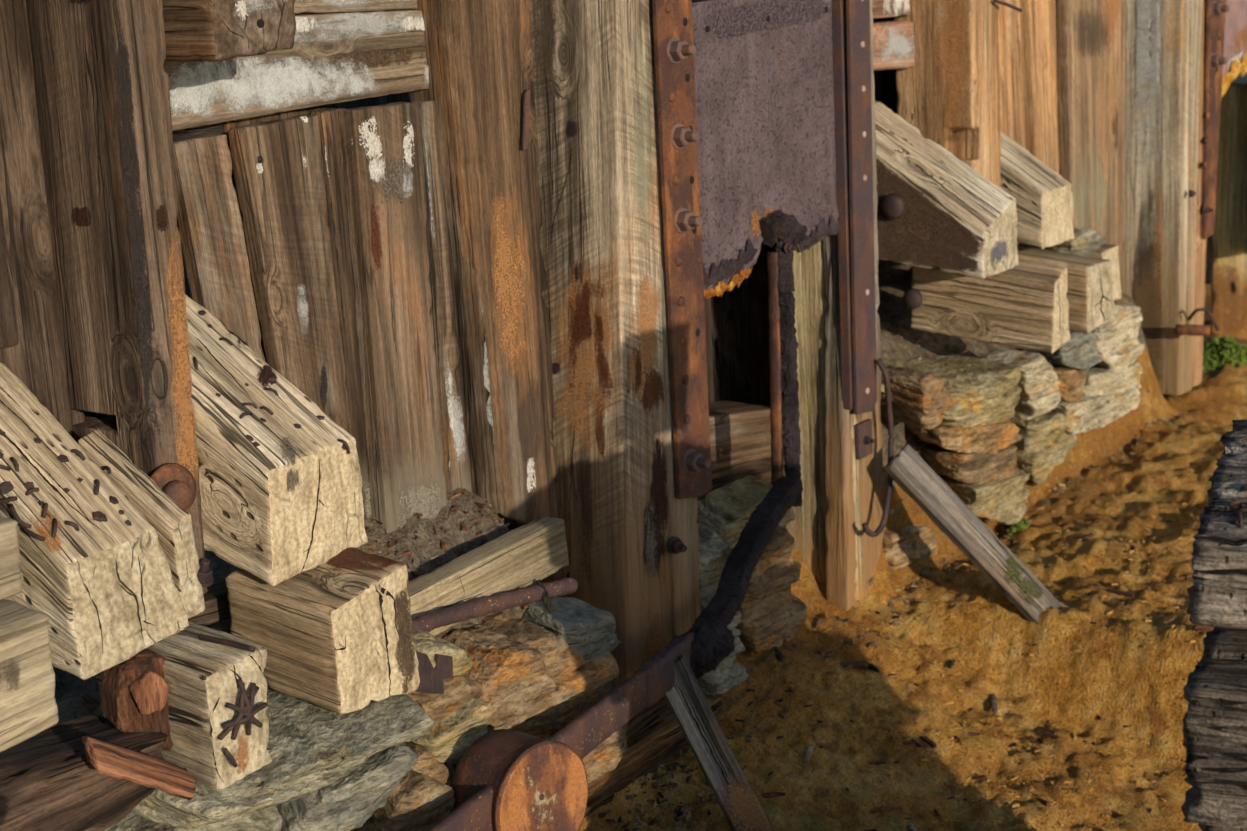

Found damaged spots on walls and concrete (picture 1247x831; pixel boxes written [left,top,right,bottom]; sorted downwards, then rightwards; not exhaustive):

leakage [235,0,260,21]
leakage [295,0,425,37]
leakage [884,0,911,57]
leakage [169,47,429,114]
corrosion [1221,29,1247,98]
leakage [352,116,431,269]